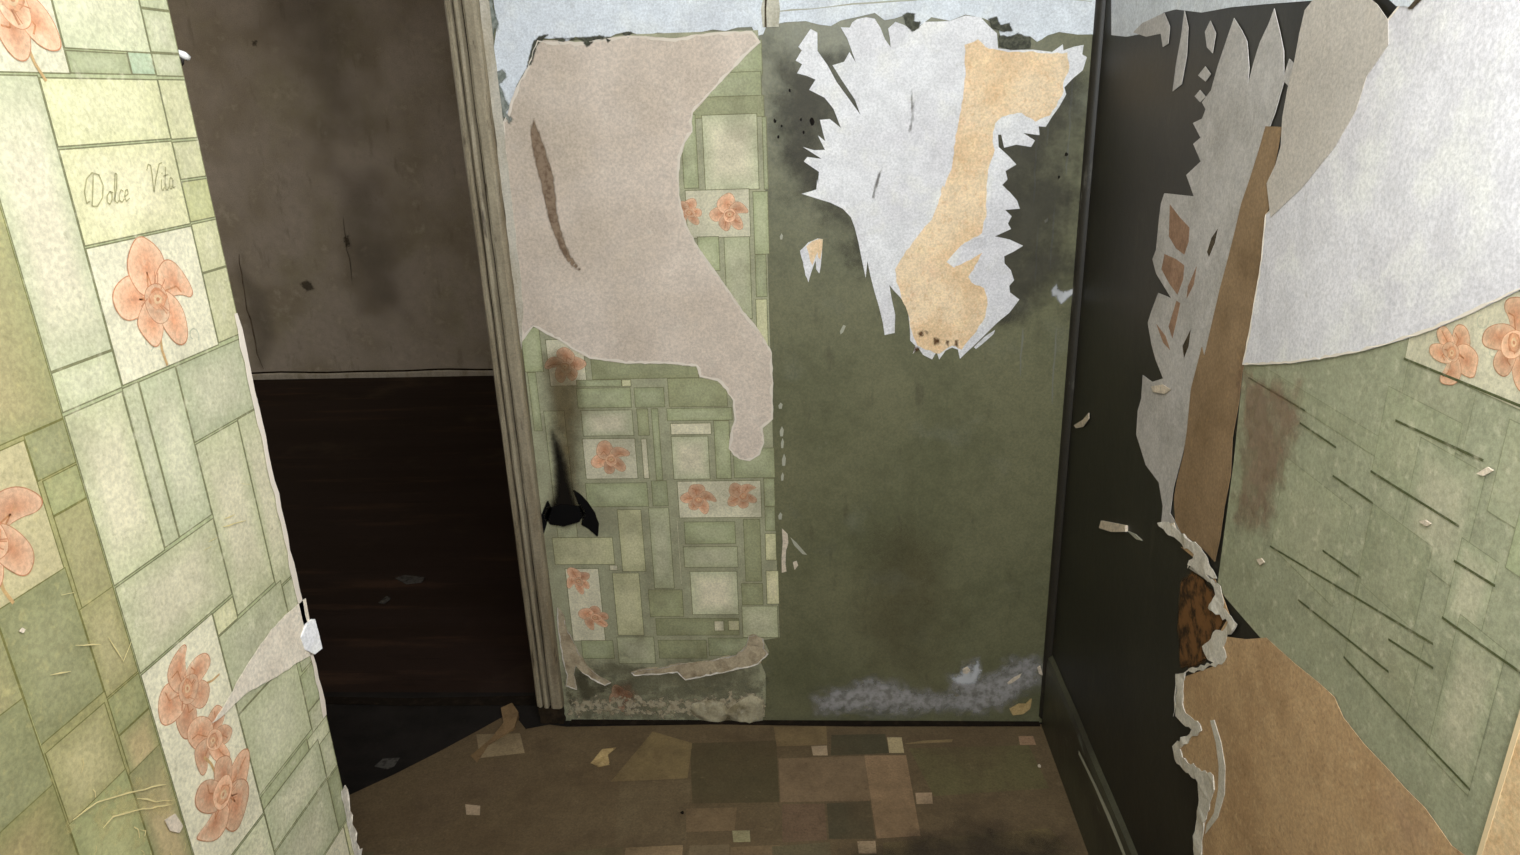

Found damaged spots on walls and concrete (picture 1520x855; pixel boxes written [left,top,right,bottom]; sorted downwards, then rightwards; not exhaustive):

peeling [902,13,920,31]
peeling [988,16,1031,50]
peeling [1242,0,1520,365]
peeling [497,31,786,481]
peeling [800,239,823,282]
peeling [1052,285,1073,304]
peeling [1099,521,1143,541]
peeling [1178,572,1224,668]
peeling [212,598,322,723]
water stain [816,659,1043,713]